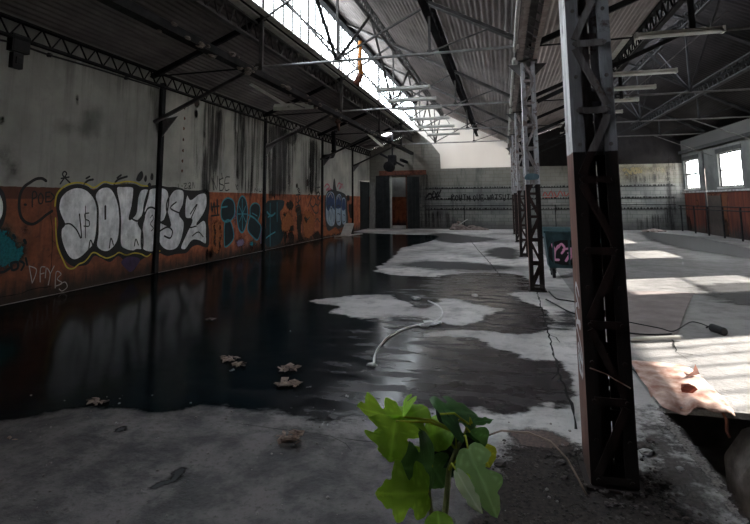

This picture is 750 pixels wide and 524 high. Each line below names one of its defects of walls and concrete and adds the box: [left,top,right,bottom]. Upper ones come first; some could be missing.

leakage [194,101,223,194]
leakage [234,109,318,198]
crack [536,292,577,429]
leakage [552,311,576,330]